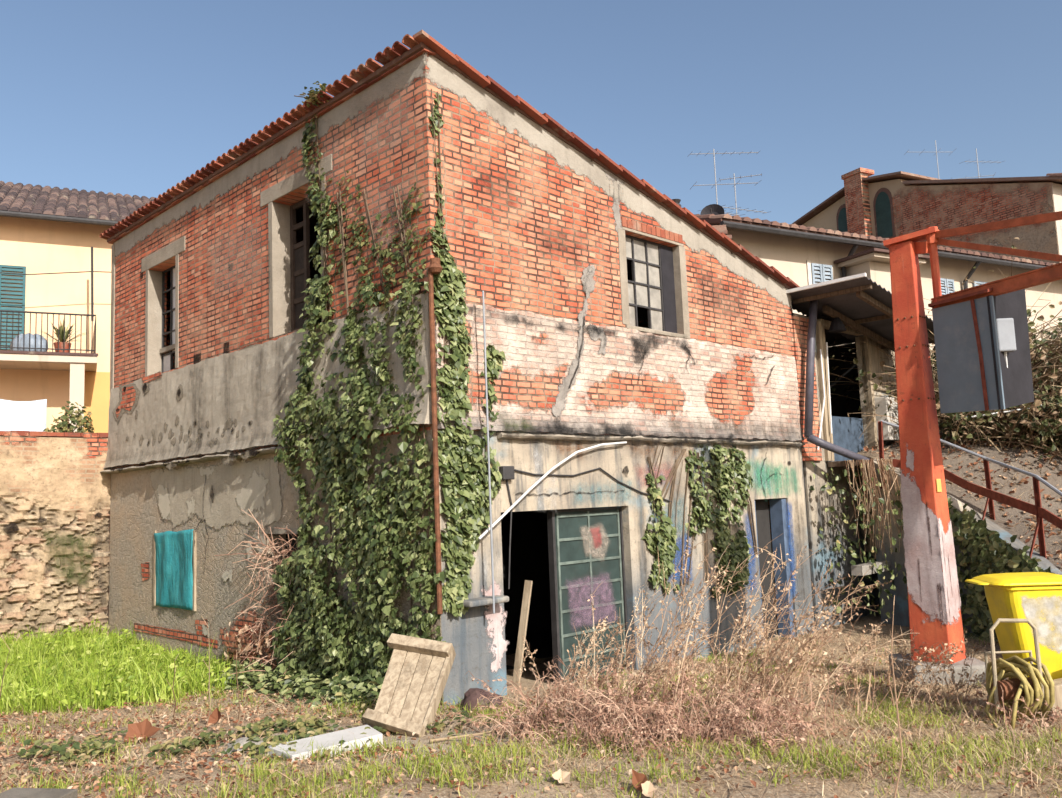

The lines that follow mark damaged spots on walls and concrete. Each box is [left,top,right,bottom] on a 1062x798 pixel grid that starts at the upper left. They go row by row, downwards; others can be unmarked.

crack [552,265,596,417]
spalling [113,371,162,424]
flaking render [464,363,568,411]
flaking render [583,371,686,418]
flaking render [705,354,755,427]
flaking render [84,432,108,458]
spalling [126,416,252,448]
water stain [506,423,734,444]
spalling [3,523,19,534]
flaking render [150,448,282,561]
peeling [900,445,961,625]
flaking render [134,609,267,663]